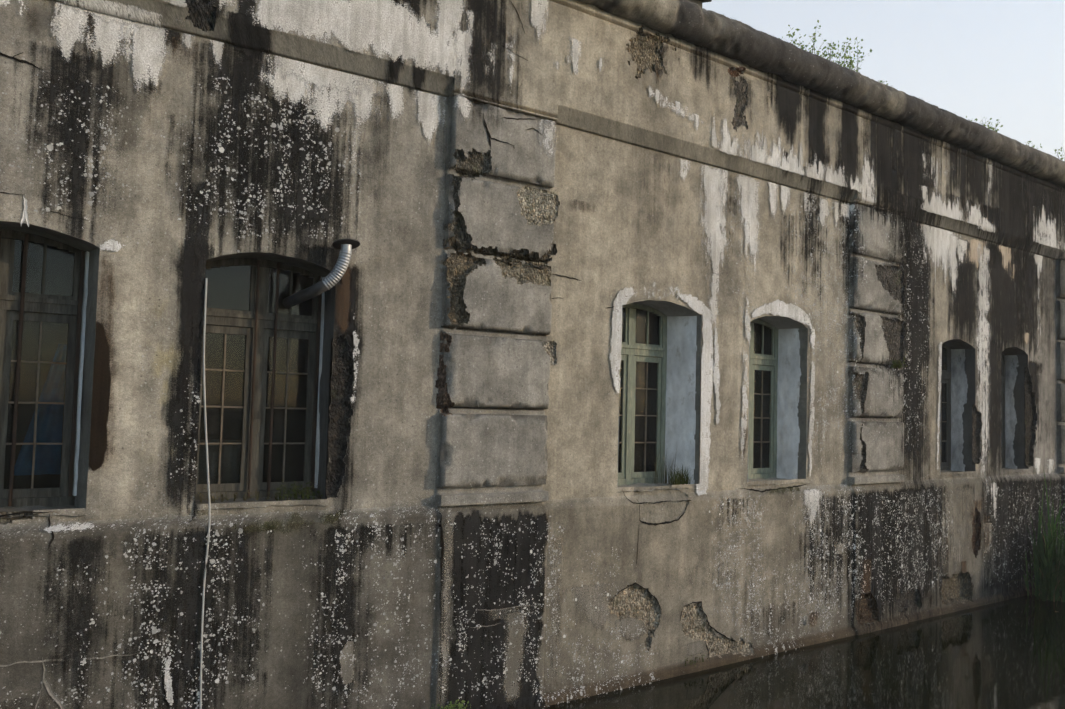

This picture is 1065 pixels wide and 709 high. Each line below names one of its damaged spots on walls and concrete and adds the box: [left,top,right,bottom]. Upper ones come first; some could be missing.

crack [0,52,40,69]
water stain [526,0,549,41]
spalling [626,26,673,77]
spalling [728,66,748,130]
crack [0,192,88,227]
spalling [435,148,559,416]
water stain [26,0,522,709]
water stain [648,72,1065,634]
crack [0,511,54,551]
crack [609,492,735,658]
water stain [436,510,647,709]
spalling [607,584,662,652]